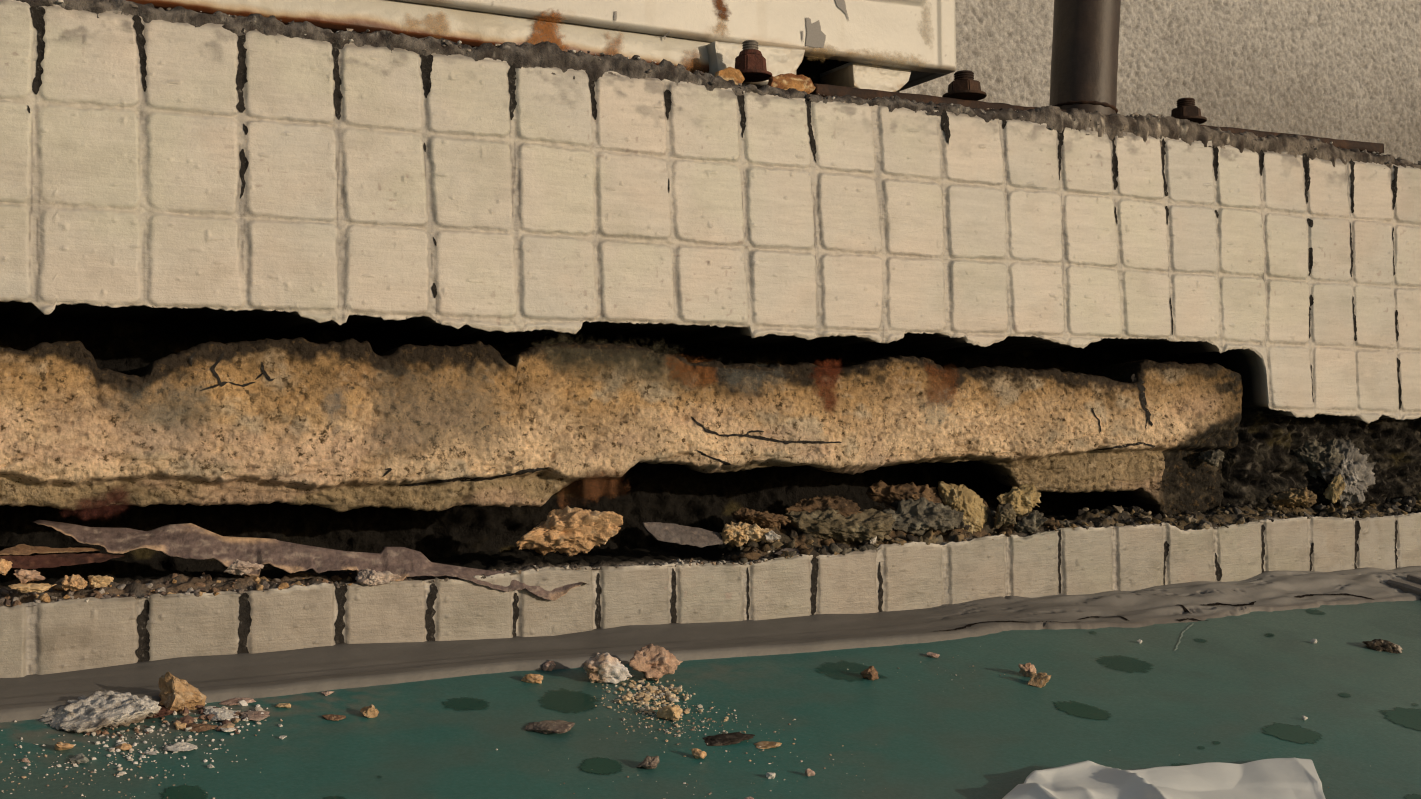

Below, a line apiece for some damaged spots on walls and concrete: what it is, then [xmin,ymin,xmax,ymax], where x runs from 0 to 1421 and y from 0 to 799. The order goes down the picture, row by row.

rust [668,357,715,386]
spalling [0,317,1421,607]
crack [691,417,842,465]